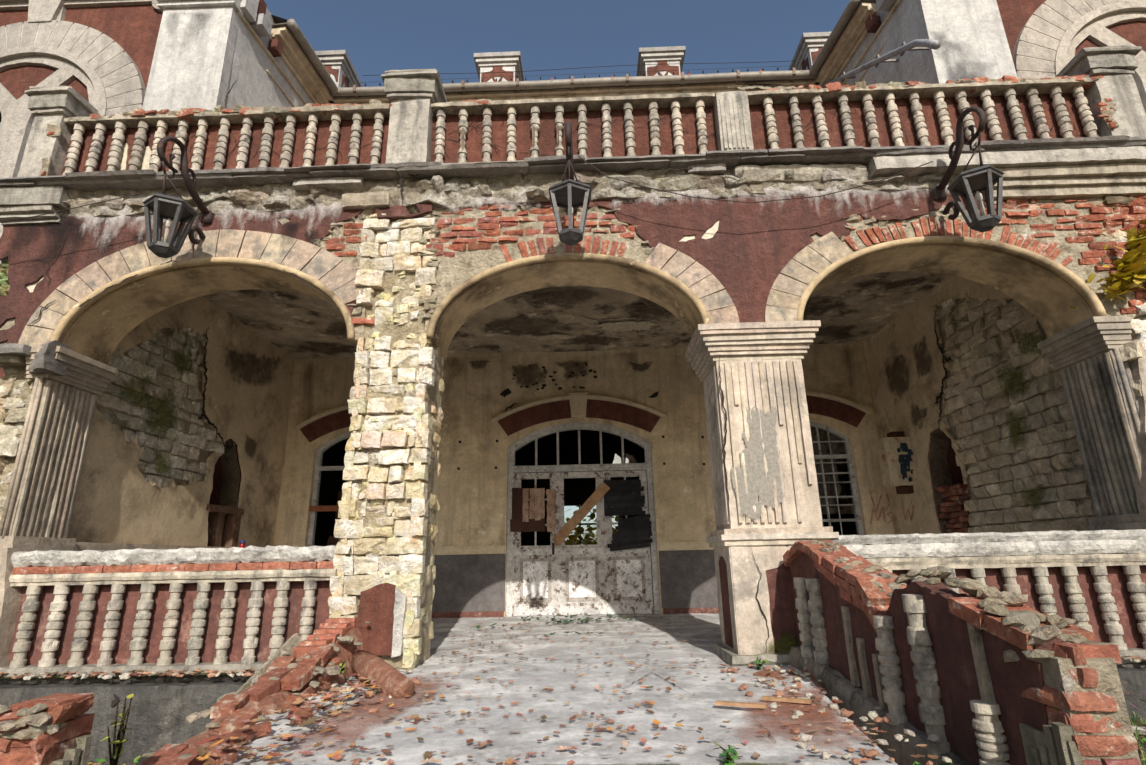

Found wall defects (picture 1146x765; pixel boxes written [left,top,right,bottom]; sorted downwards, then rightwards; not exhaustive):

crack [198,326,234,450]
peeling [299,304,375,354]
spalling [311,203,656,322]
peeling [484,298,674,345]
crack [719,358,729,522]
peeling [731,405,785,520]
peeling [803,306,850,338]
crack [934,310,953,431]
spalling [840,194,1146,314]
spalling [928,292,1097,534]
spalling [1120,339,1143,362]
spalling [1132,380,1142,397]